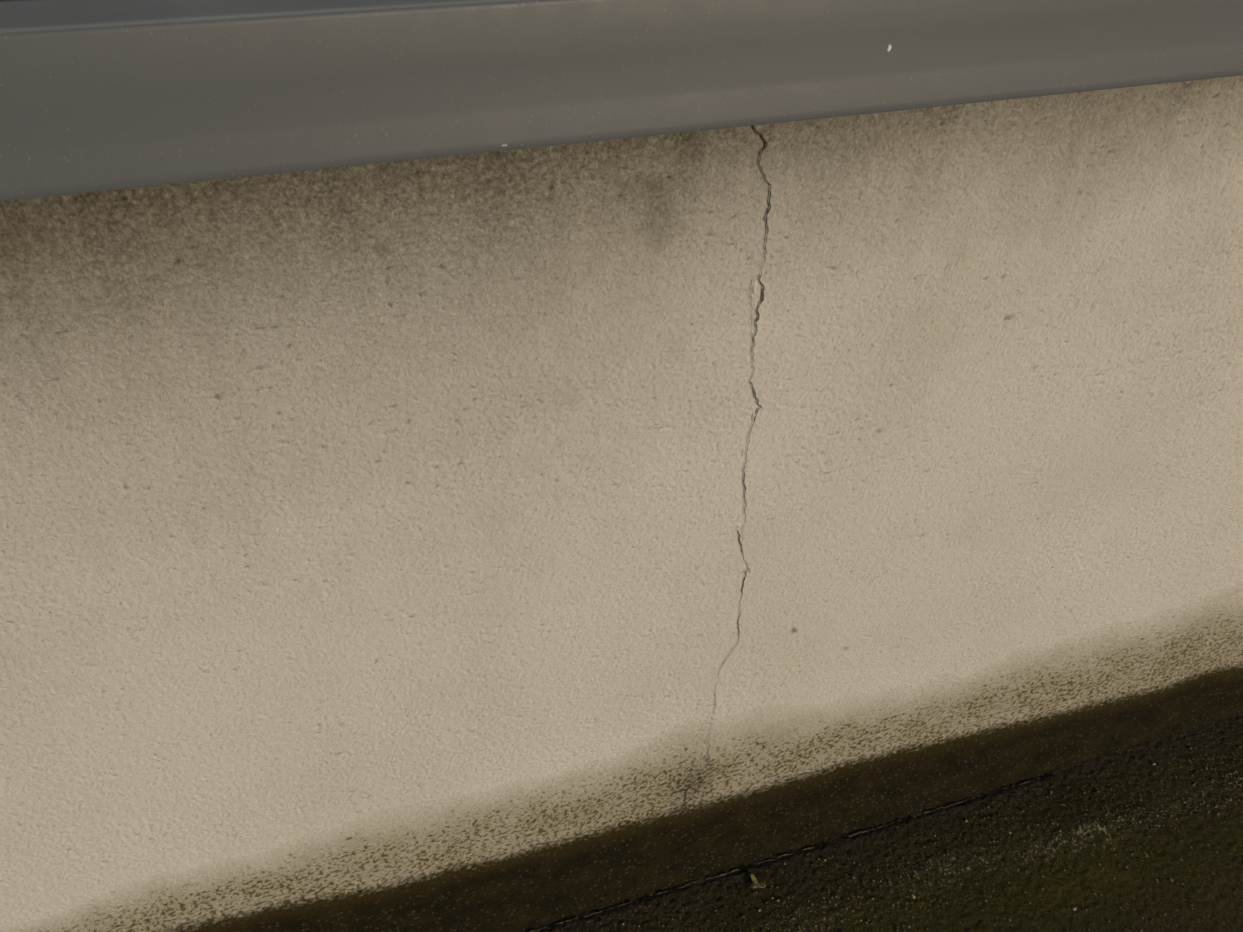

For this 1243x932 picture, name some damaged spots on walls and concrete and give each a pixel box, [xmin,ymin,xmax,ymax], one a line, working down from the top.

water stain [40,612,1243,932]
crack [684,125,771,809]